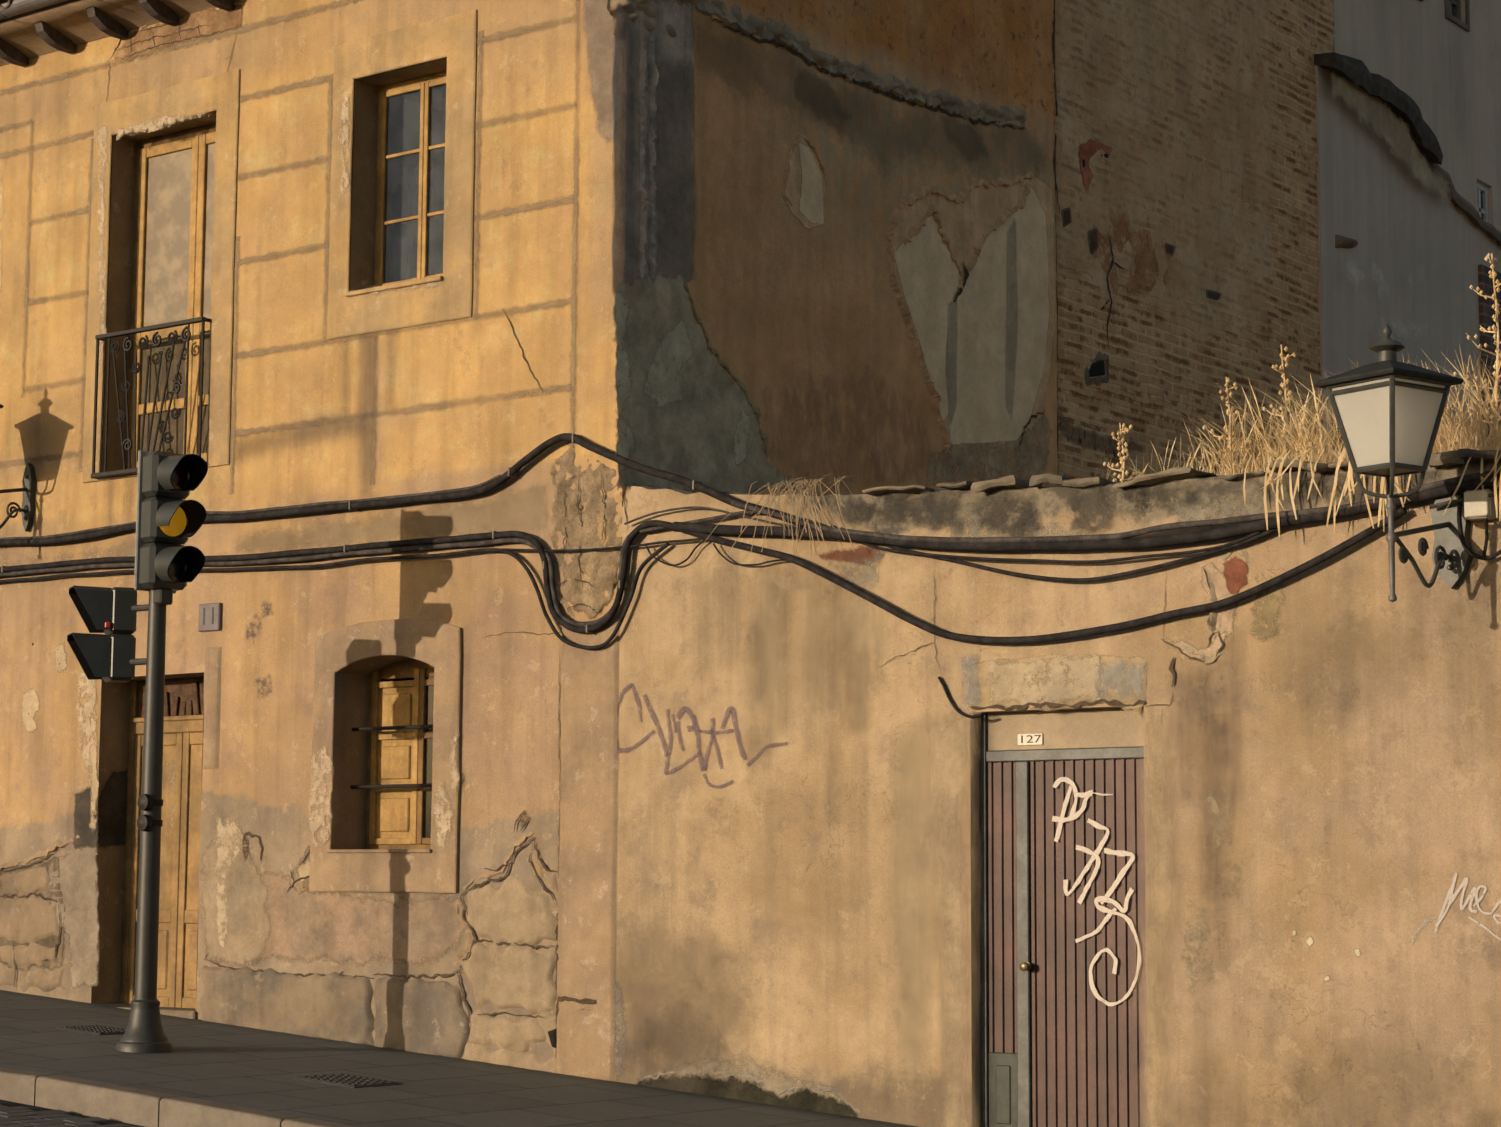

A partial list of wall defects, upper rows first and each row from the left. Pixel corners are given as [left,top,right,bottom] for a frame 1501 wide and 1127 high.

peeling [781,132,826,230]
spalling [1079,139,1111,190]
spalling [1088,211,1176,295]
crack [503,310,543,391]
peeling [884,170,1072,485]
spalling [1089,361,1105,377]
spalling [550,446,624,620]
spalling [1161,547,1285,687]
spalling [21,688,40,732]
peeling [54,644,99,829]
peeling [287,747,332,895]
peeling [433,735,459,848]